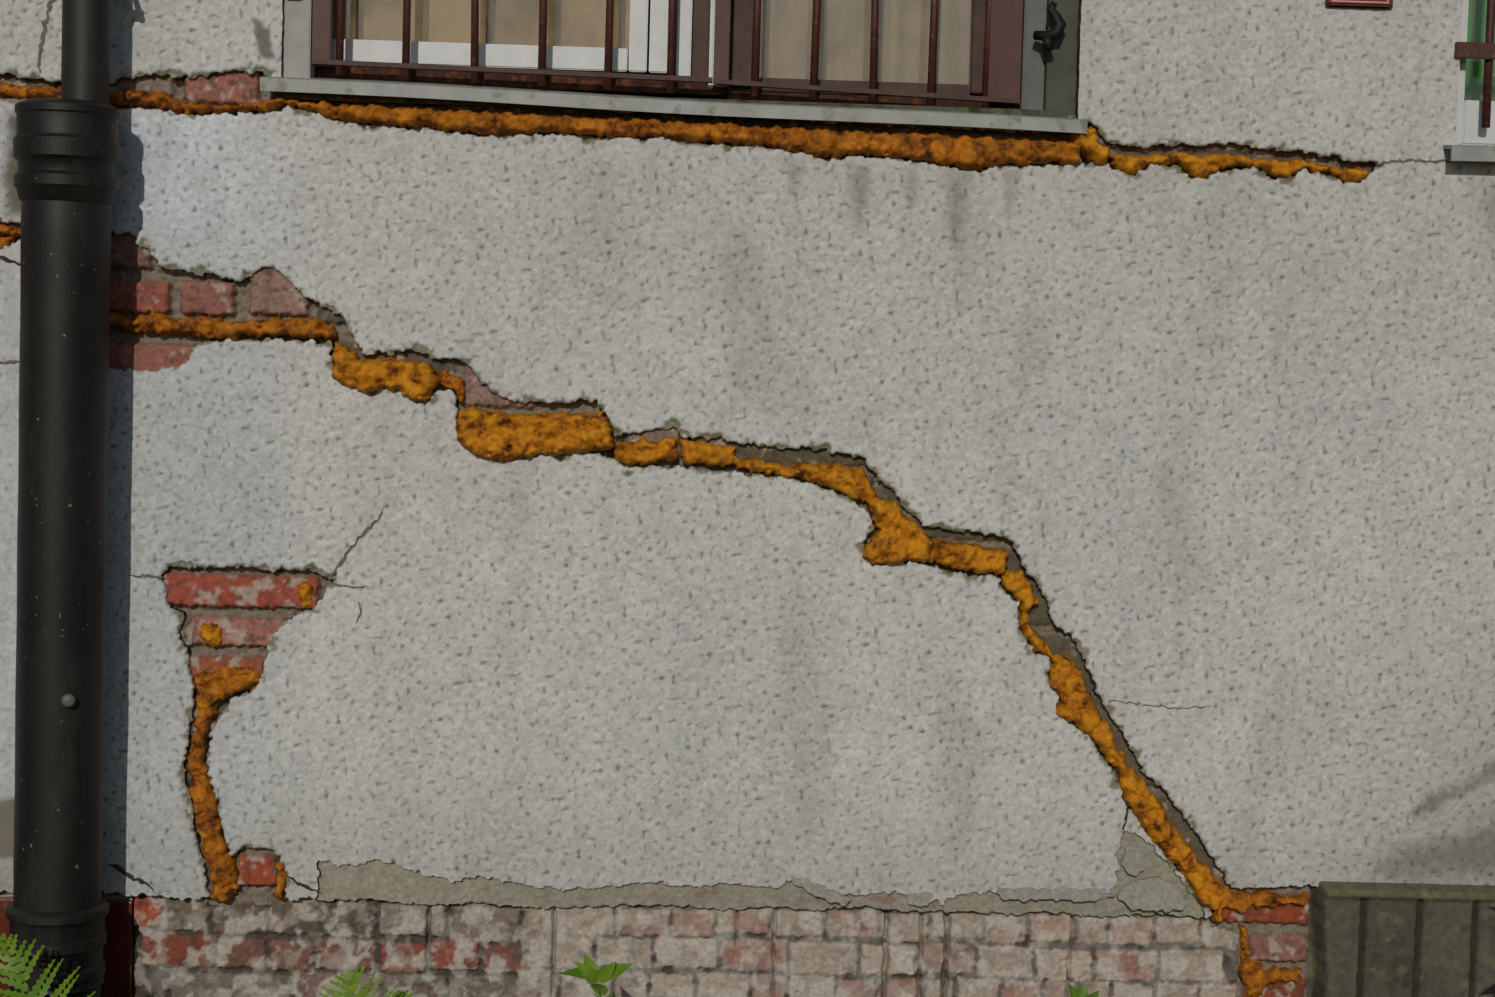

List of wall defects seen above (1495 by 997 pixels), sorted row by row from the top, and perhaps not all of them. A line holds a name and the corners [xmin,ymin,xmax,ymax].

crack [109,71,1452,183]
flaking render [0,221,21,266]
crack [109,232,1225,919]
flaking render [126,508,1311,997]
flaking render [107,863,154,893]